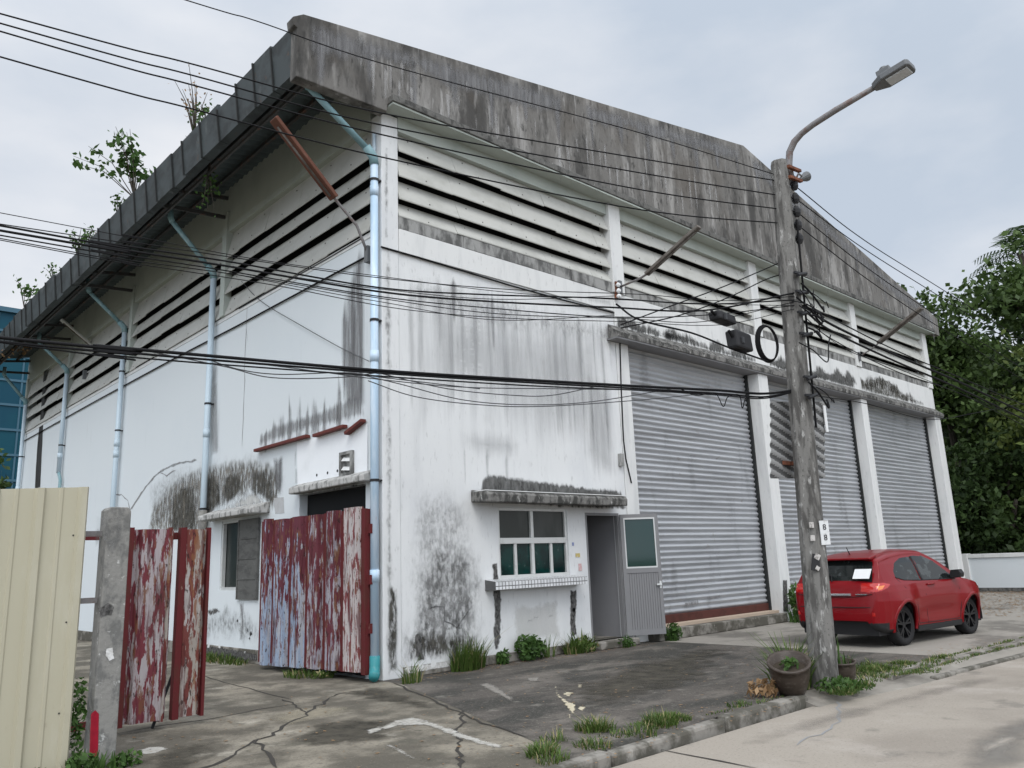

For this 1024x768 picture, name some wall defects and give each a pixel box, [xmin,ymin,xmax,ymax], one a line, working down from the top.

damp [260,262,362,446]
mould [618,319,752,360]
mould [809,367,916,403]
damp [151,459,282,530]
damp [411,544,472,660]